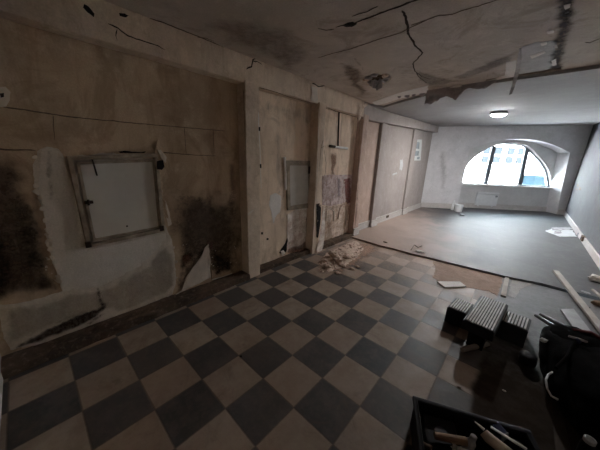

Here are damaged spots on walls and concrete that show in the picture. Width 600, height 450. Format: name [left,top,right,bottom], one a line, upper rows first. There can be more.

crack [108,23,163,49]
crack [318,0,497,83]
leakage [0,164,52,296]
leakage [179,197,240,277]